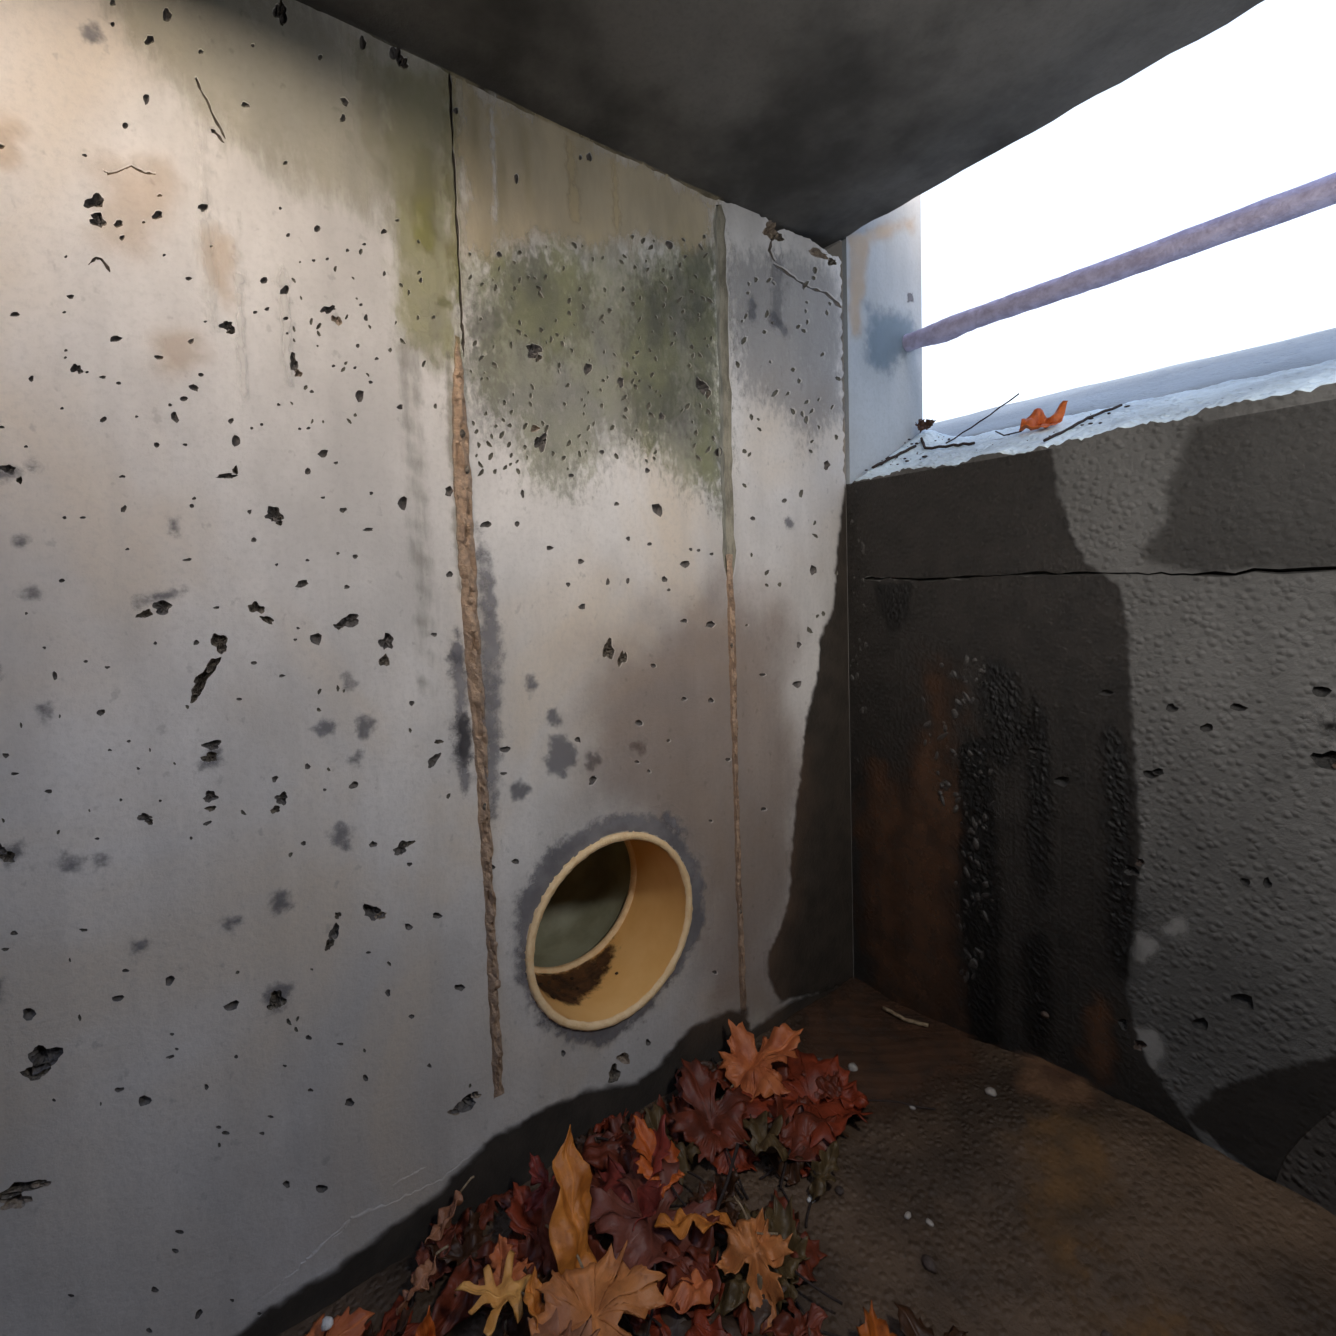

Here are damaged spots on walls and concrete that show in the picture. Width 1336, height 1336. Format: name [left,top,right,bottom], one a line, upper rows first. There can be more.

water stain [238,448,1336,1336]
crack [865,566,1336,582]